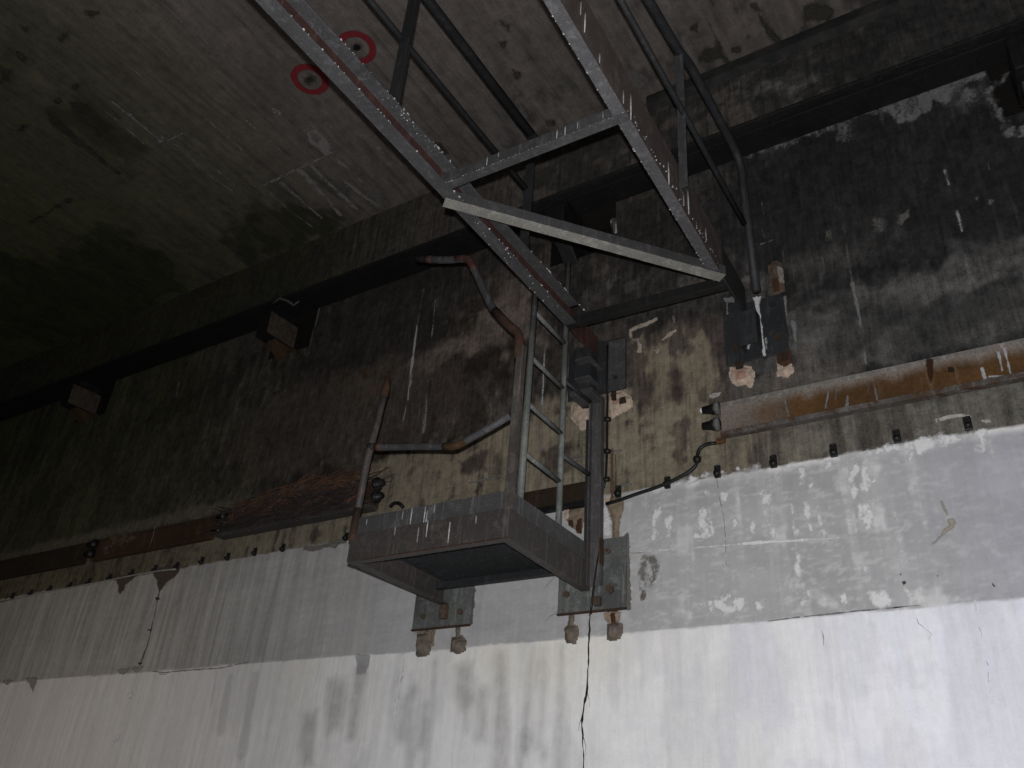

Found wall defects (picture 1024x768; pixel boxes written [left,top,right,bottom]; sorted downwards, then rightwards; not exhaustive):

leakage [850,278,862,328]
spalling [729,360,755,388]
spalling [776,350,794,378]
spalling [570,403,589,431]
spalling [608,390,633,419]
peeling [693,492,728,539]
peeling [846,465,877,534]
peeling [866,589,892,609]
crack [138,590,250,675]
crack [579,614,591,768]